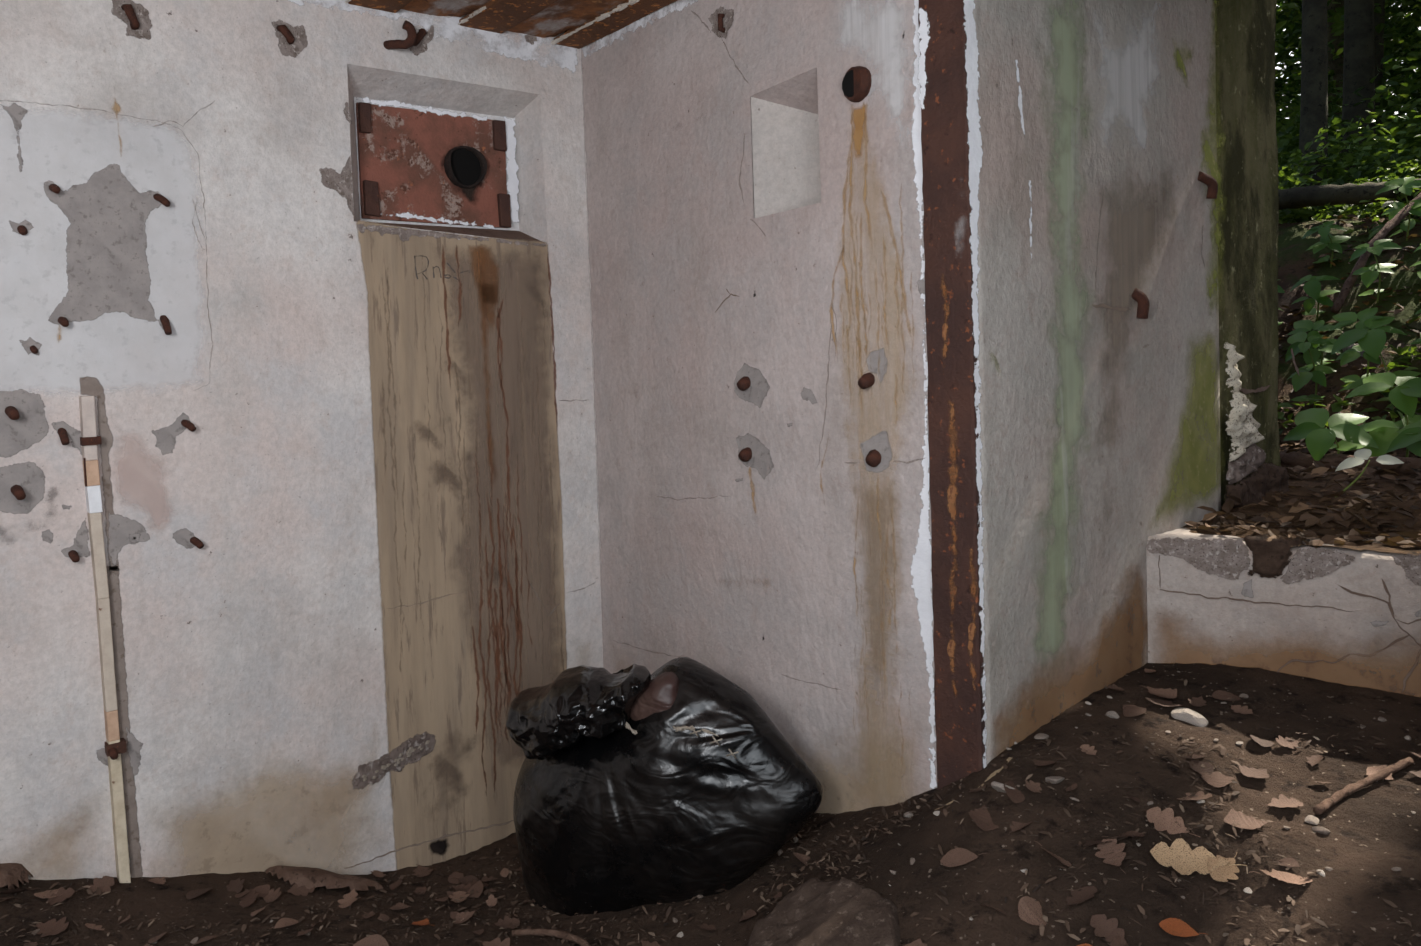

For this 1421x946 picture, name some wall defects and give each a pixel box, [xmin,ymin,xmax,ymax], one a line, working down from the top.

spalling [111,0,152,40]
spalling [272,20,308,58]
peeling [288,0,698,73]
rust [832,106,869,314]
spalling [44,164,164,330]
spalling [0,389,82,514]
spalling [42,521,90,557]
spalling [108,513,150,565]
spalling [1147,537,1254,598]
spalling [1281,546,1355,584]
crack [1158,555,1421,692]
spalling [352,732,436,789]